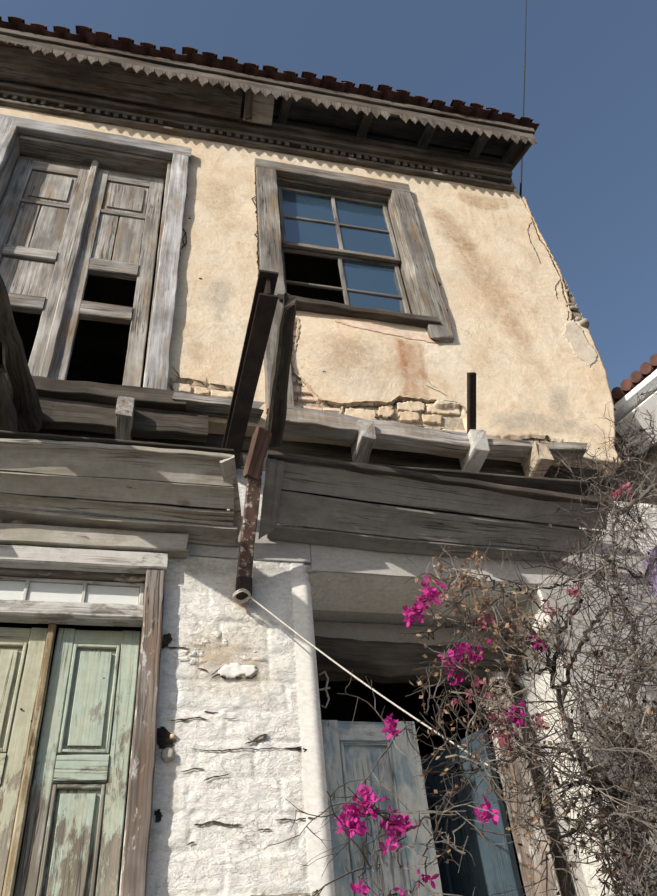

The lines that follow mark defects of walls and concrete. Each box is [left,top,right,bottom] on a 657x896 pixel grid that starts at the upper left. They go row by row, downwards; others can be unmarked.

crack [527,204,569,321]
spalling [333,317,443,345]
flaking render [292,369,466,430]
peeling [178,631,265,680]
crack [171,711,235,721]
spalling [157,726,176,763]
crack [180,734,307,781]
crack [187,817,313,845]